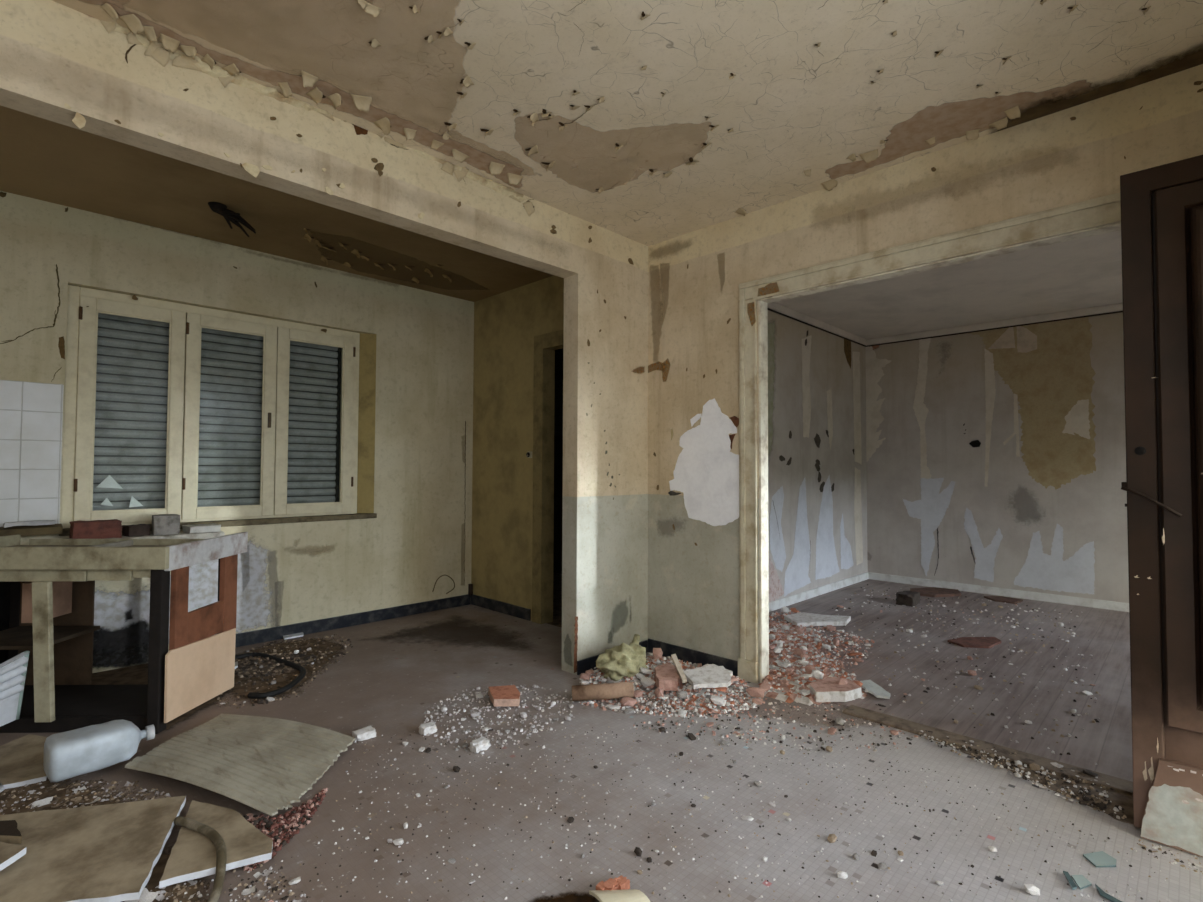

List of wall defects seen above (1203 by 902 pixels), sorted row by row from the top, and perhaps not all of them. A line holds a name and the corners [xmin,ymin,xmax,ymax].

flaking render [64,103,86,129]
peeling [80,0,555,216]
peeling [513,109,566,131]
peeling [570,90,604,111]
peeling [685,116,734,165]
peeling [804,80,1093,191]
crack [0,264,60,344]
flaking render [729,416,739,449]
peeling [814,430,834,492]
peeling [656,479,681,496]
flaking render [769,557,784,603]
peeling [1138,784,1203,868]